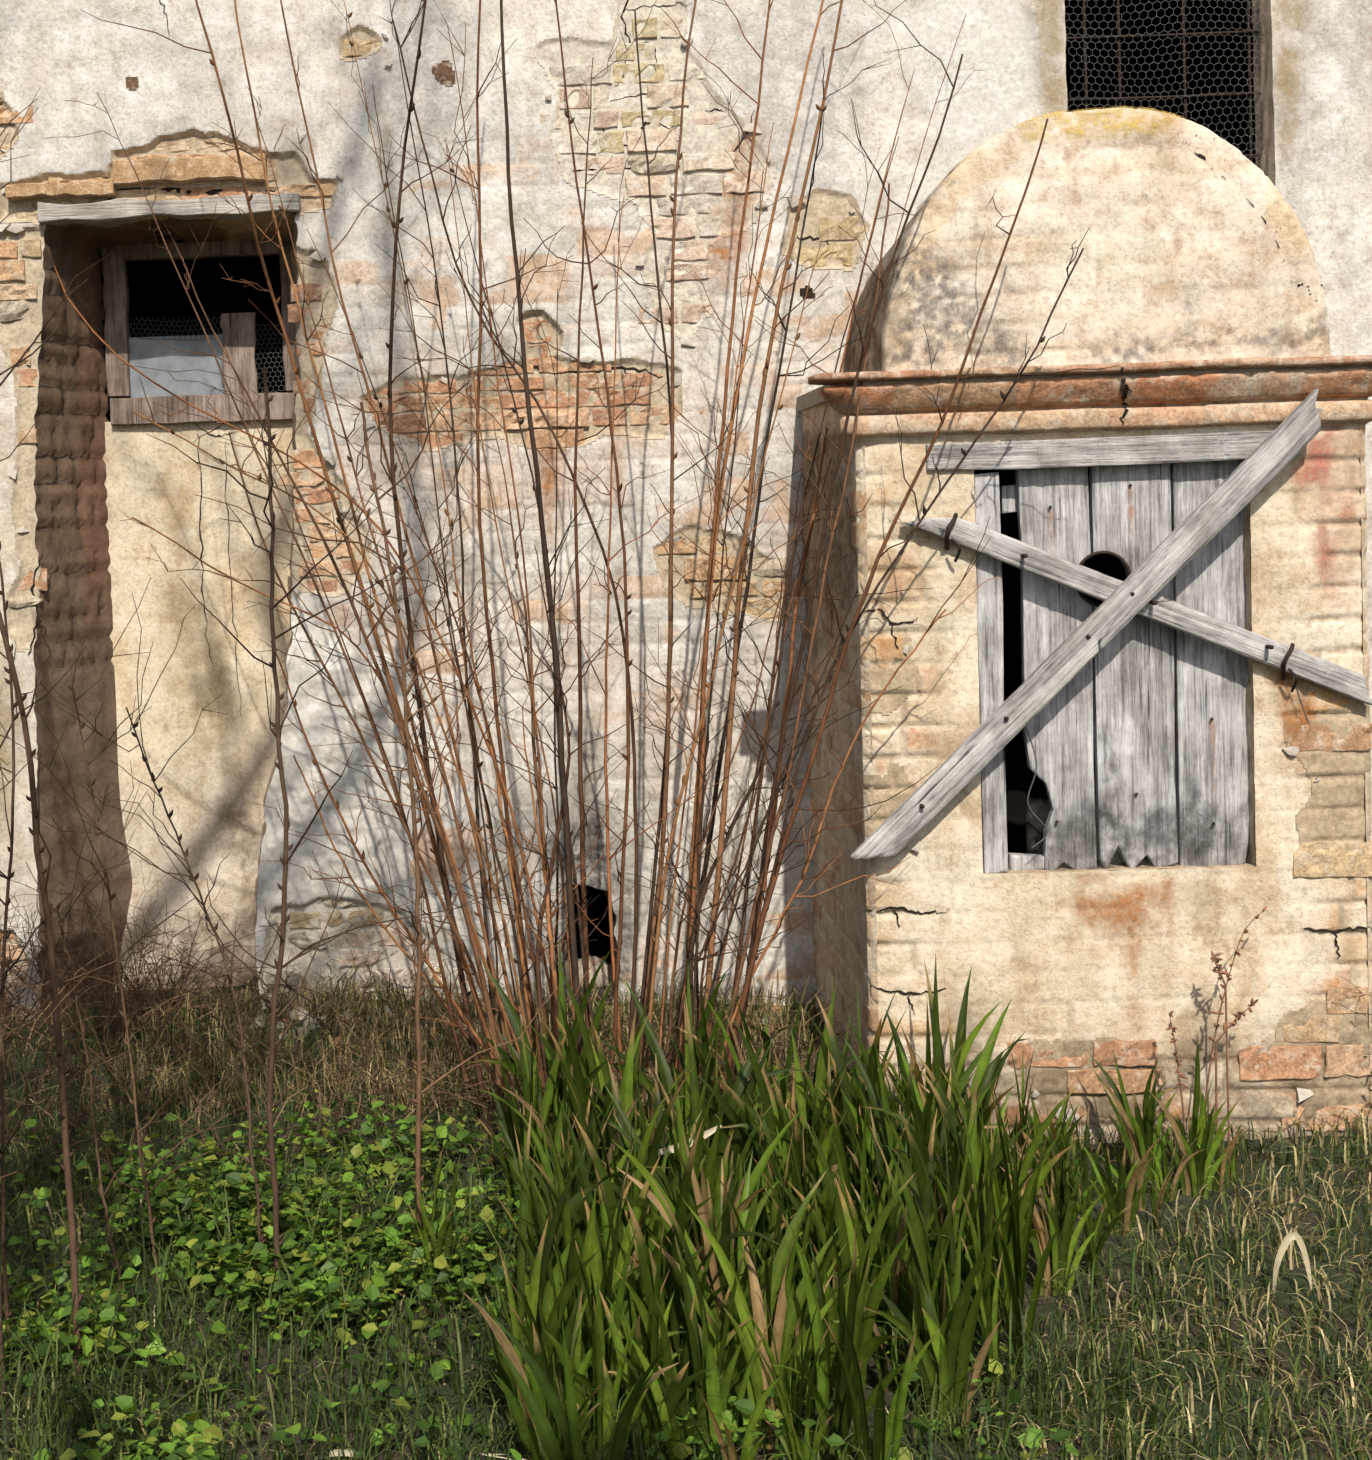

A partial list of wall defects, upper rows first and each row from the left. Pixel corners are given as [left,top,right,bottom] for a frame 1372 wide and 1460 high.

spalling [339,24,392,67]
flaking render [126,77,139,90]
flaking render [432,60,455,86]
peeling [0,91,34,159]
spalling [532,0,870,347]
spalling [0,129,343,657]
spalling [361,310,704,453]
crack [864,608,918,649]
crack [866,906,949,927]
crack [1303,926,1370,959]
crack [870,985,947,1016]